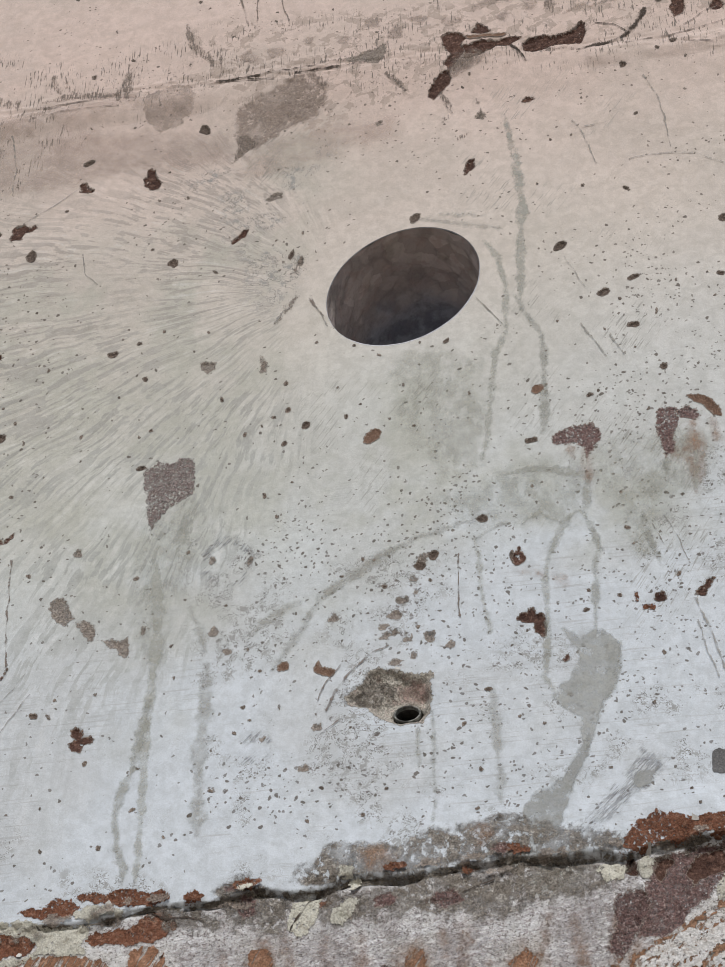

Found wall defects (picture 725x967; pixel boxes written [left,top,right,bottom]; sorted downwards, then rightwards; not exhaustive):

spalling [428,19,587,100]
spalling [552,422,601,458]
spalling [646,393,722,458]
spalling [136,458,195,530]
peeling [0,629,725,967]
crack [589,833,725,862]
crack [32,855,559,931]